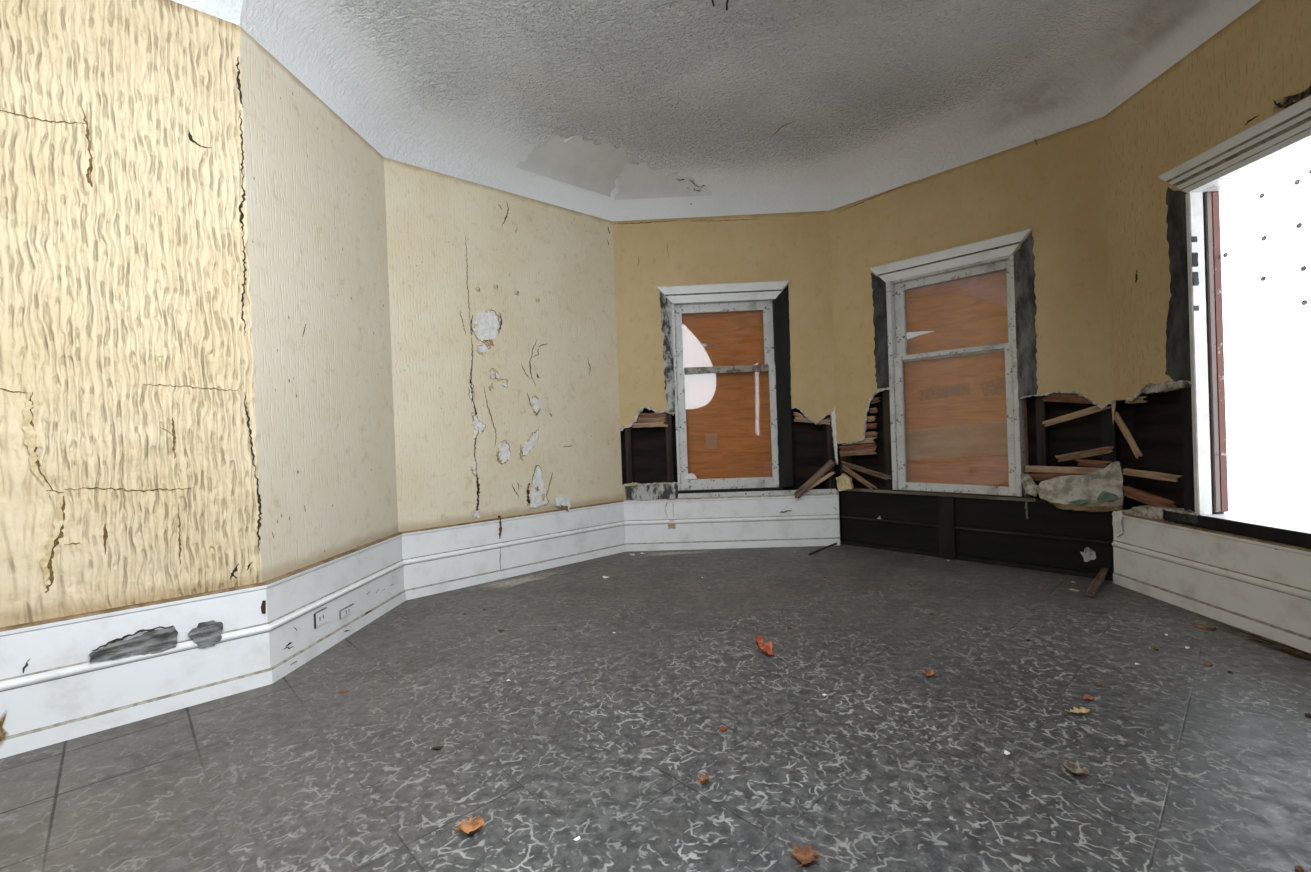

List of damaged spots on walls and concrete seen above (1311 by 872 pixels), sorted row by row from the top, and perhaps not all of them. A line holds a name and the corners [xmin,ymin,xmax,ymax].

peeling [467,309,508,440]
flaking render [792,273,893,489]
flaking render [1013,187,1224,537]
peeling [496,396,571,512]
spalling [89,620,223,663]